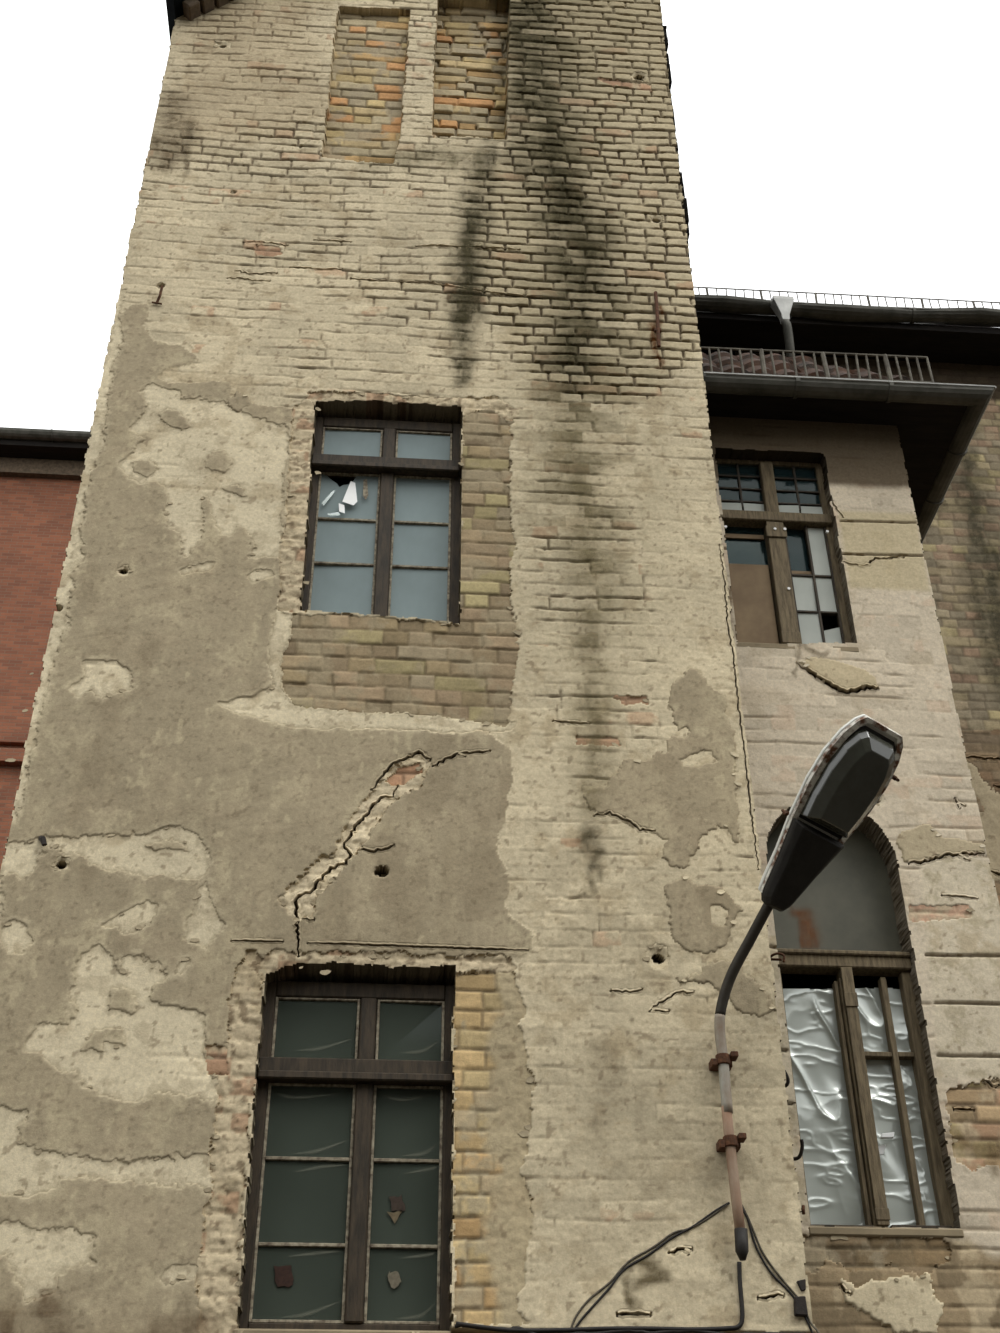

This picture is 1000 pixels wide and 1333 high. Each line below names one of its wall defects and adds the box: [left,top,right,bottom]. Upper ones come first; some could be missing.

flaking render [5,289,133,823]
flaking render [118,383,295,583]
flaking render [218,407,522,733]
flaking render [613,695,648,706]
flaking render [799,656,879,691]
crack [232,749,528,958]
flaking render [0,826,229,1102]
flaking render [0,1105,215,1198]
flaking render [451,971,536,1326]
flaking render [945,1077,1000,1172]
flaking render [803,1236,951,1333]